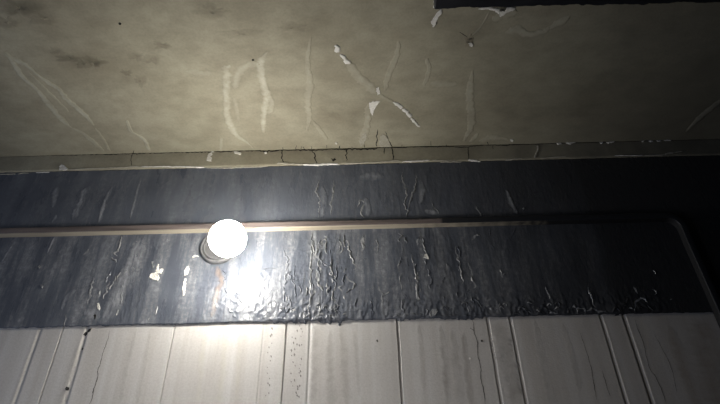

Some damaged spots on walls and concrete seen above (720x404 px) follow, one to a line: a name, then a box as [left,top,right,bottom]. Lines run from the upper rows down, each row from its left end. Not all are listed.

peeling [59,151,268,171]
water stain [219,51,275,151]
crack [48,142,562,166]
peeling [277,45,481,166]
peeling [83,236,163,336]
crack [472,320,485,398]